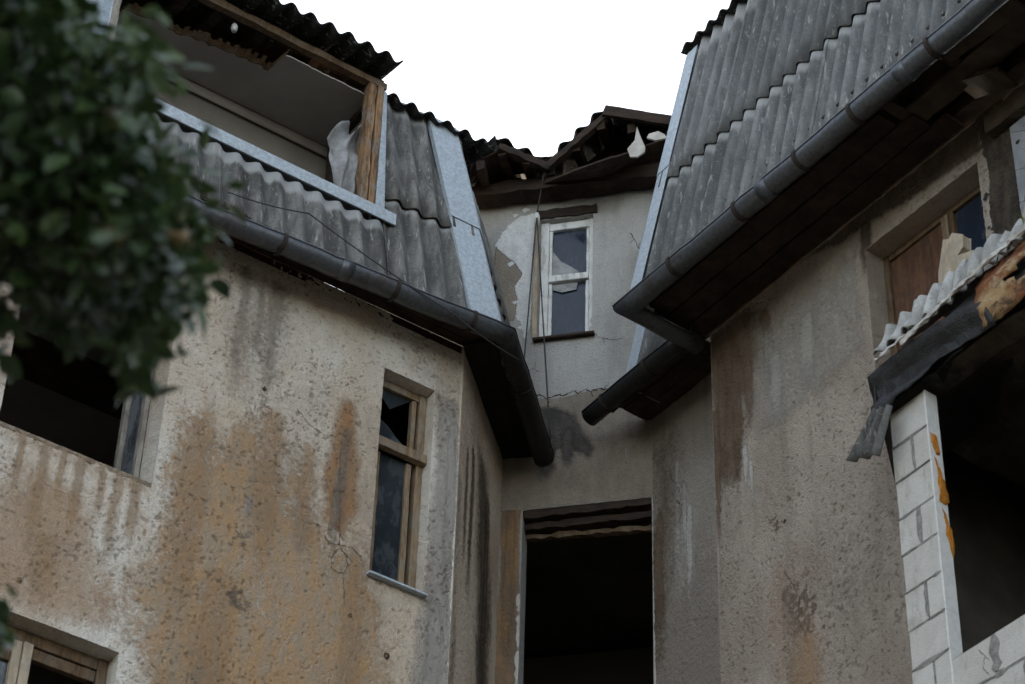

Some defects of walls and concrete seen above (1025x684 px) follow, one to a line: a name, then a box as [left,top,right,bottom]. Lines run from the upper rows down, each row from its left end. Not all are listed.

peeling [494,208,535,338]
water stain [30,441,68,522]
water stain [97,464,140,542]
rust [123,402,386,684]
crack [292,409,362,605]